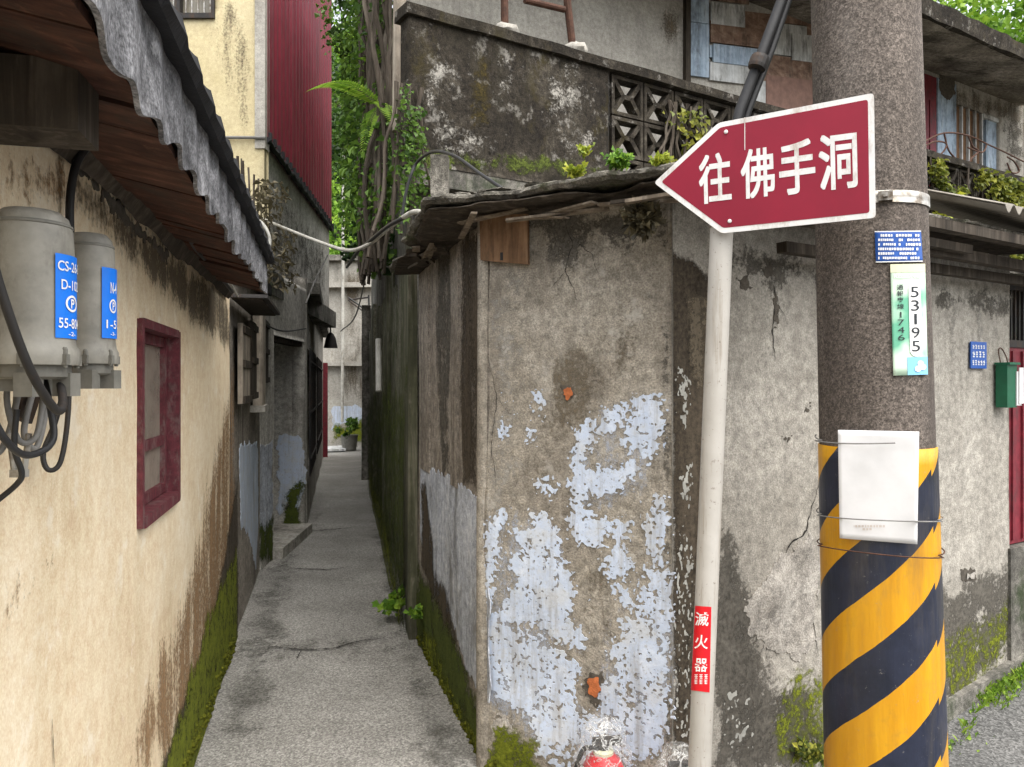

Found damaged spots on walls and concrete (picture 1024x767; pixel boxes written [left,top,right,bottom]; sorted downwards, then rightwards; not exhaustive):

damp [10,157,231,350]
damp [215,483,239,638]
peeling [420,366,694,767]
crack [786,485,819,553]
damp [164,655,216,767]